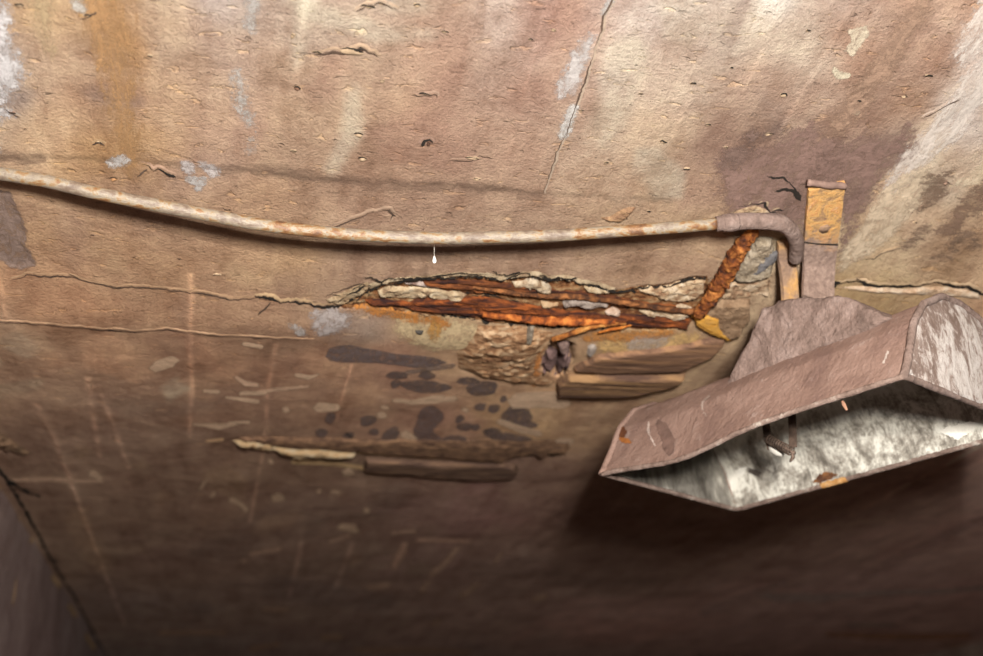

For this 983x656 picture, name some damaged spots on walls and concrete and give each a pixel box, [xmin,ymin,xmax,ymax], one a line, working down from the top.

leakage [0,2,23,117]
crack [544,0,616,193]
leakage [840,0,983,272]
crack [0,271,371,340]
flaking render [202,373,319,404]
corrosion [353,302,451,343]
leakage [326,315,538,442]
spalling [325,271,713,409]
corrosion [482,312,674,343]
corrosion [473,229,759,320]
crack [834,246,983,295]
flaking render [193,419,574,480]